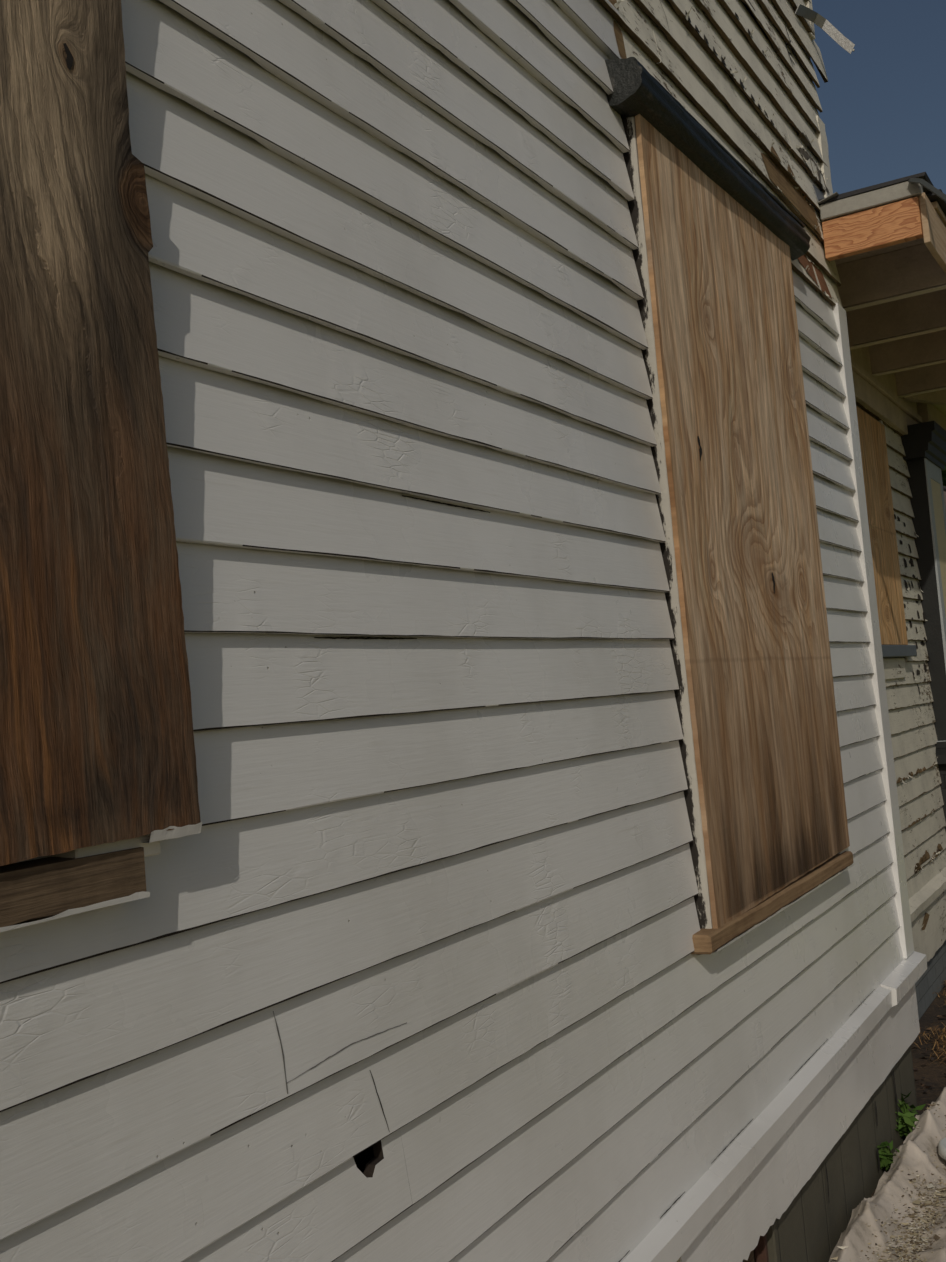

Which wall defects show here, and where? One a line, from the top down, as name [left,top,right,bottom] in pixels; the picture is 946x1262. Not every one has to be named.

peeling [609,0,627,59]
peeling [685,8,821,235]
peeling [894,514,930,681]
peeling [897,758,937,784]
peeling [915,844,944,874]
crack [273,1011,406,1094]
crack [370,1071,390,1132]